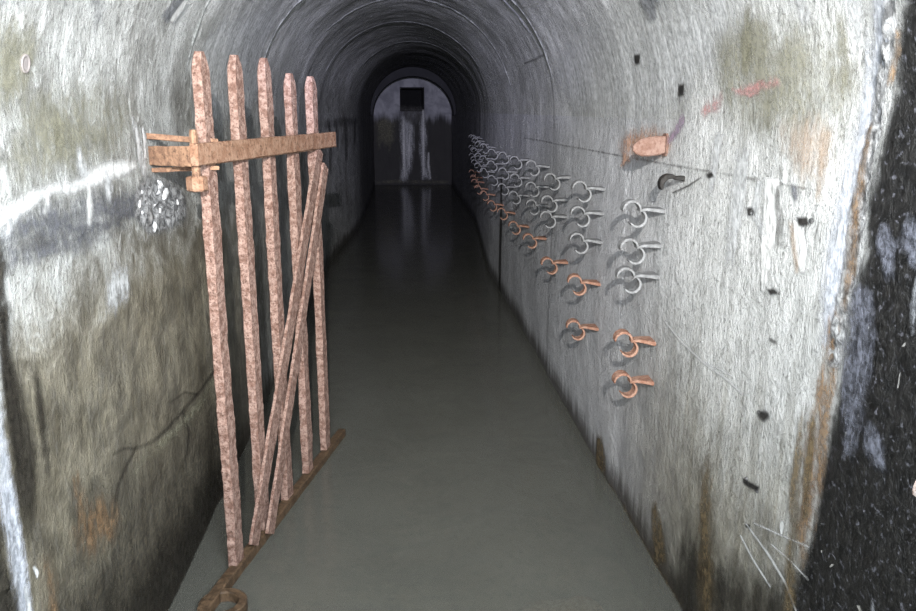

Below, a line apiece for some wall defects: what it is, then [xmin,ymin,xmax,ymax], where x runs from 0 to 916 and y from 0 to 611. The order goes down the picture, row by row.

leakage [557,0,810,126]
leakage [0,111,146,257]
spalling [135,178,186,233]
leakage [109,272,128,307]
leakage [662,0,916,611]
leakage [0,248,48,611]
crack [116,448,133,498]
crack [153,371,214,455]
leakage [596,437,605,472]
rust [785,320,836,611]
leakage [125,464,224,611]
leakage [650,505,665,568]